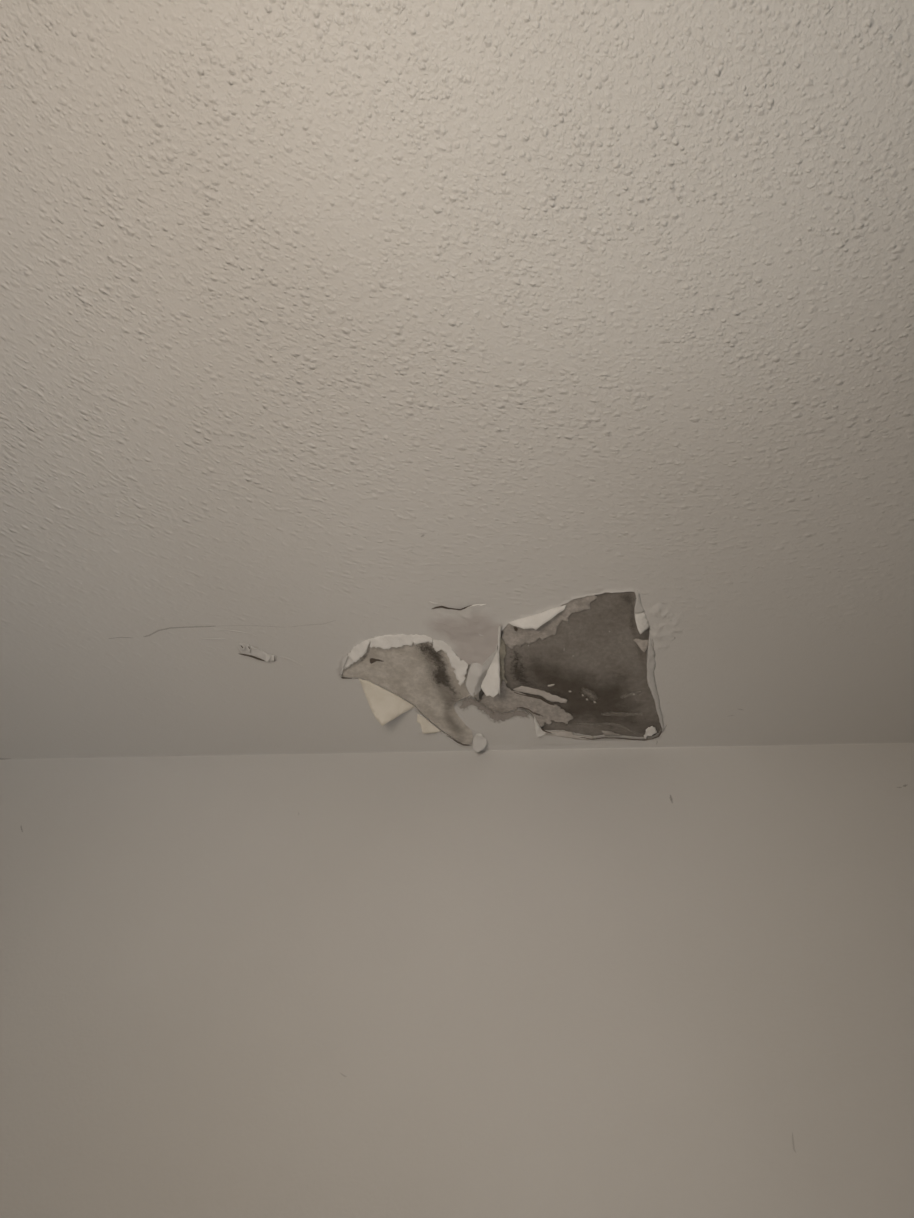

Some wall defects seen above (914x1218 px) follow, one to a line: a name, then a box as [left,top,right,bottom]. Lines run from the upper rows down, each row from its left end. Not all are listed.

peeling [340,590,664,752]